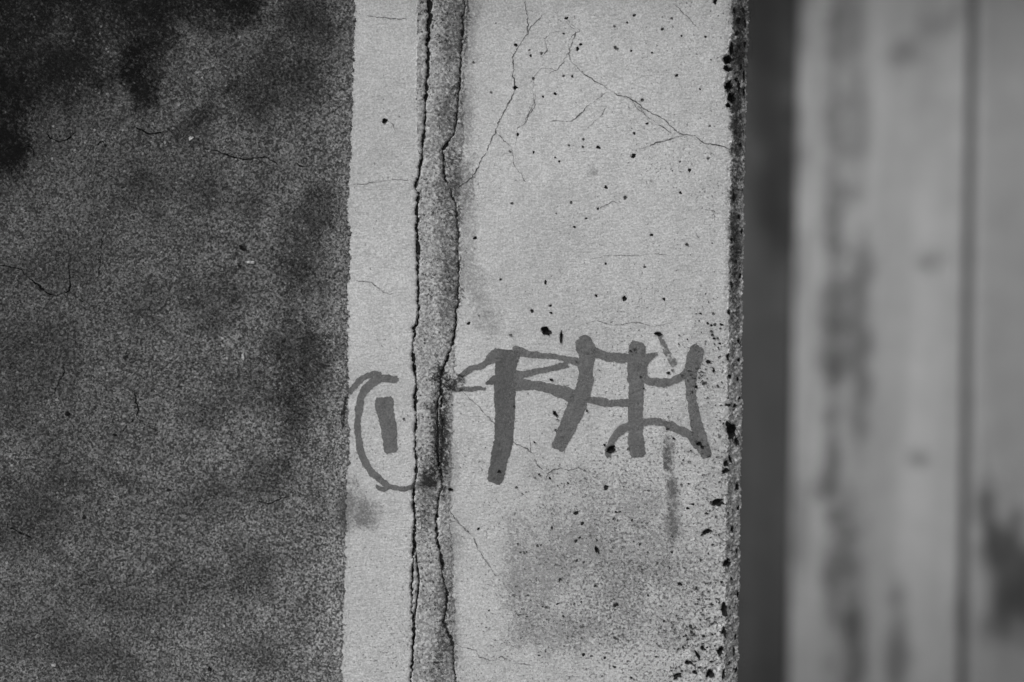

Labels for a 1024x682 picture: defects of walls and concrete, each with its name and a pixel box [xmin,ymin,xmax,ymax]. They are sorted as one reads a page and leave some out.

damp [0,0,266,188]
crack [354,0,729,682]